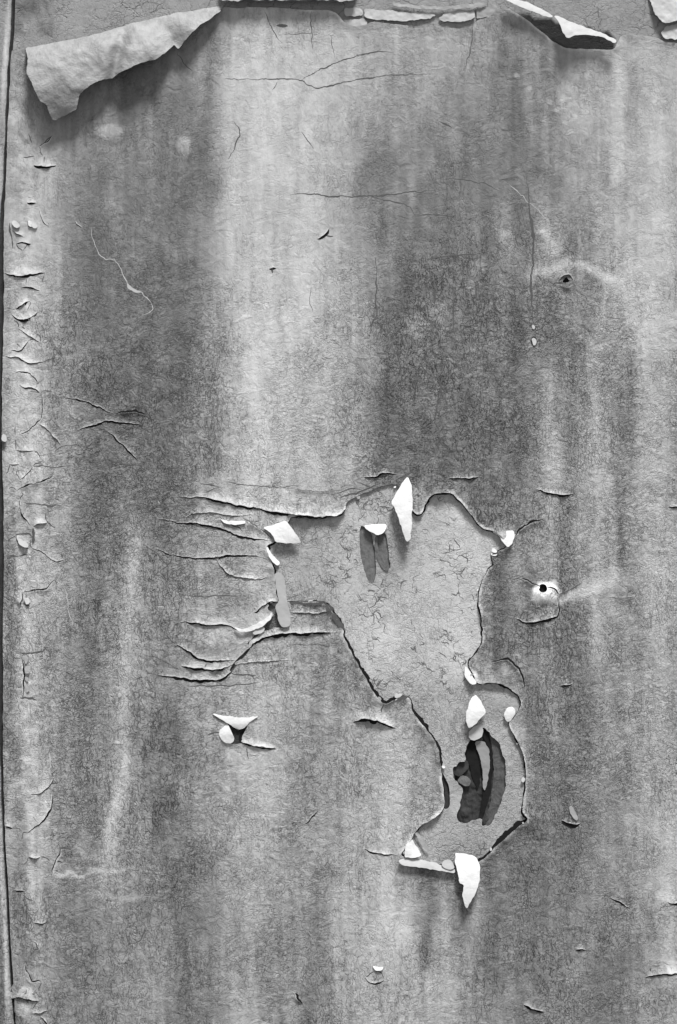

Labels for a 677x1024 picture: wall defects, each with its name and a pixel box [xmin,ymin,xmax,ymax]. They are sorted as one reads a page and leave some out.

peeling [26,0,240,120]
crack [226,14,422,90]
peeling [326,0,616,43]
peeling [650,0,677,40]
crack [5,196,398,687]
damp [347,30,677,1024]
peeling [213,714,258,743]
peeling [235,477,527,913]